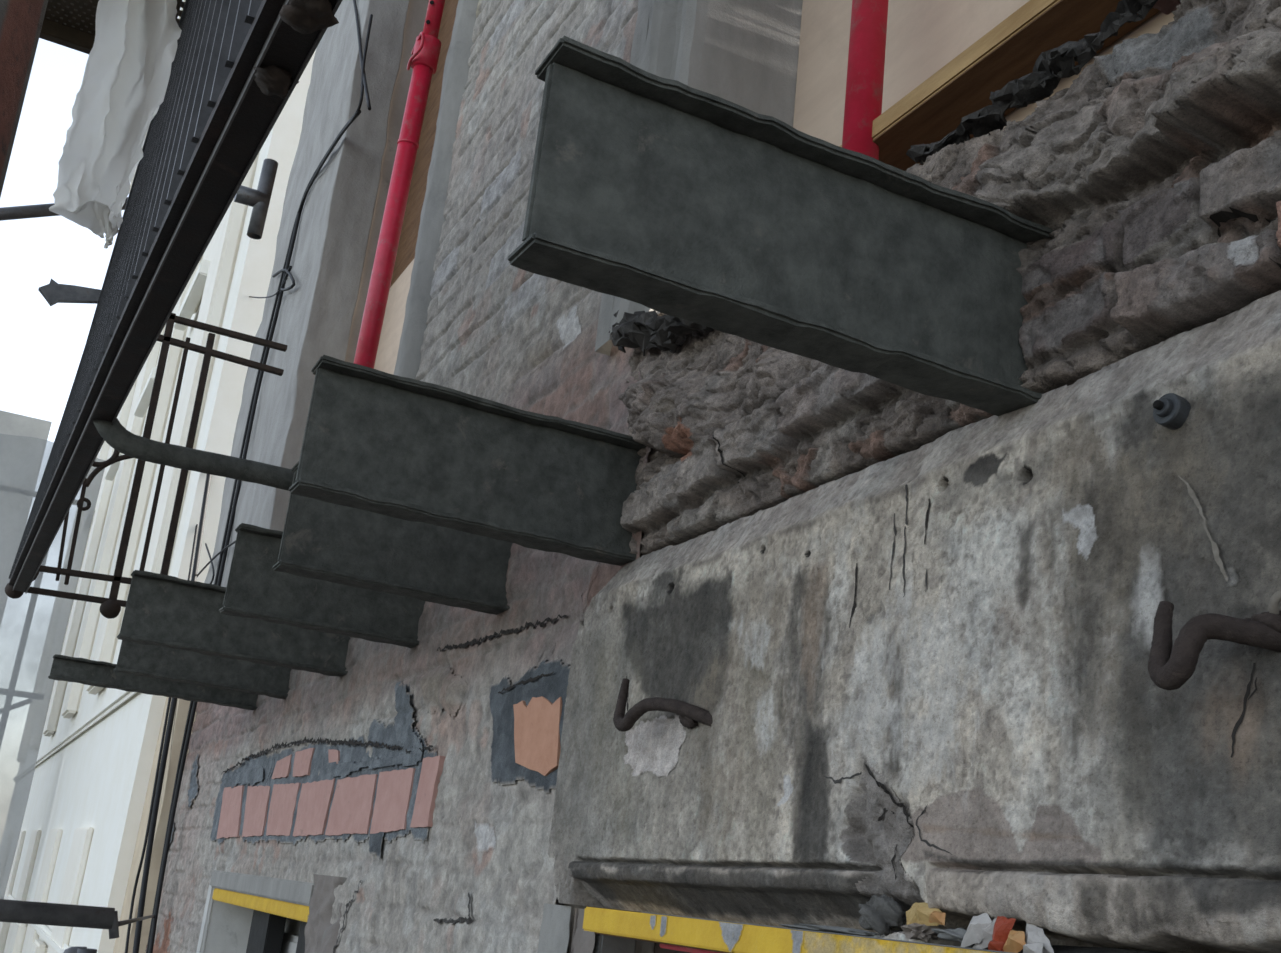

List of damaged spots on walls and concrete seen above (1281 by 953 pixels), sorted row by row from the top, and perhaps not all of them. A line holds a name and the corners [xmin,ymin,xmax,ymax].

spalling [906,0,1281,394]
spalling [619,329,994,557]
crack [849,563,858,628]
crack [889,484,930,597]
peeling [1060,503,1099,561]
damp [245,547,872,926]
spalling [623,714,687,778]
peeling [730,609,781,762]
crack [824,771,862,784]
crack [916,804,952,855]
peeling [808,541,1105,929]
crack [1231,663,1257,758]